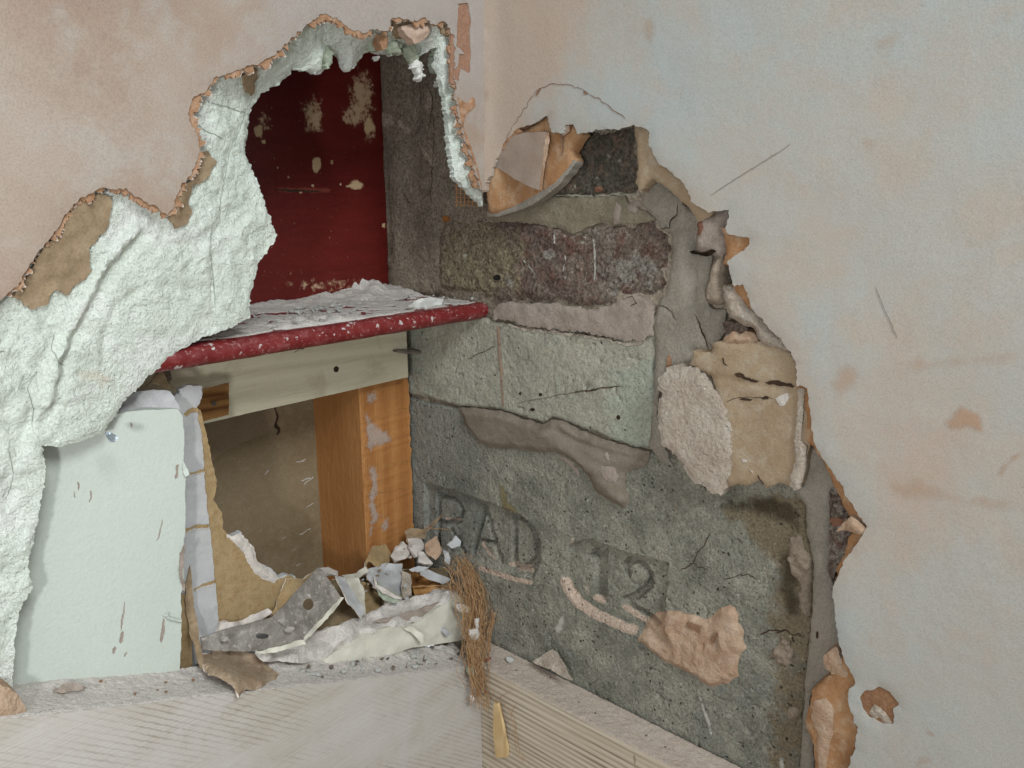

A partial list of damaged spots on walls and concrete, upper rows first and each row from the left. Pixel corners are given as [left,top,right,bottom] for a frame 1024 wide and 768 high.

peeling [448,3,591,217]
crack [505,83,625,142]
peeling [634,125,720,222]
crack [710,144,790,196]
peeling [722,228,749,266]
peeling [731,284,753,310]
spalling [510,322,622,342]
flaking render [657,340,863,521]
peeling [835,533,863,581]
flaking render [469,618,480,640]
peeling [533,649,573,680]
peeling [805,642,899,768]